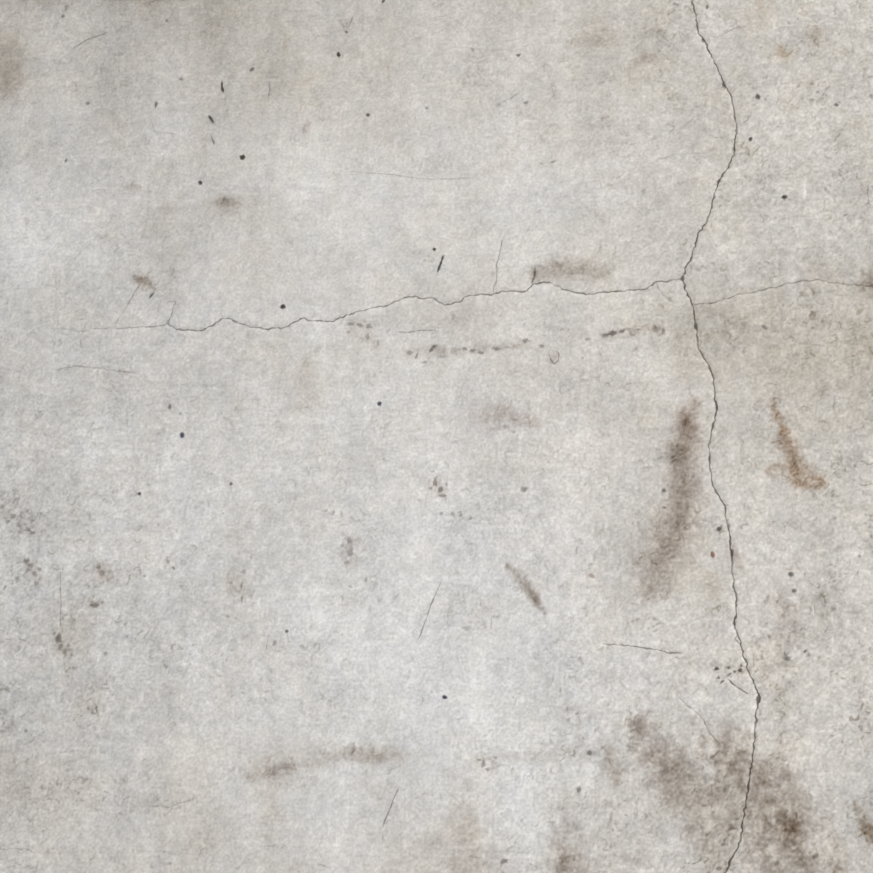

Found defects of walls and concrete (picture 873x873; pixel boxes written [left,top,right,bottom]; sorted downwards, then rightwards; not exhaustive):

crack [569,2,736,558]
crack [725,582,761,873]